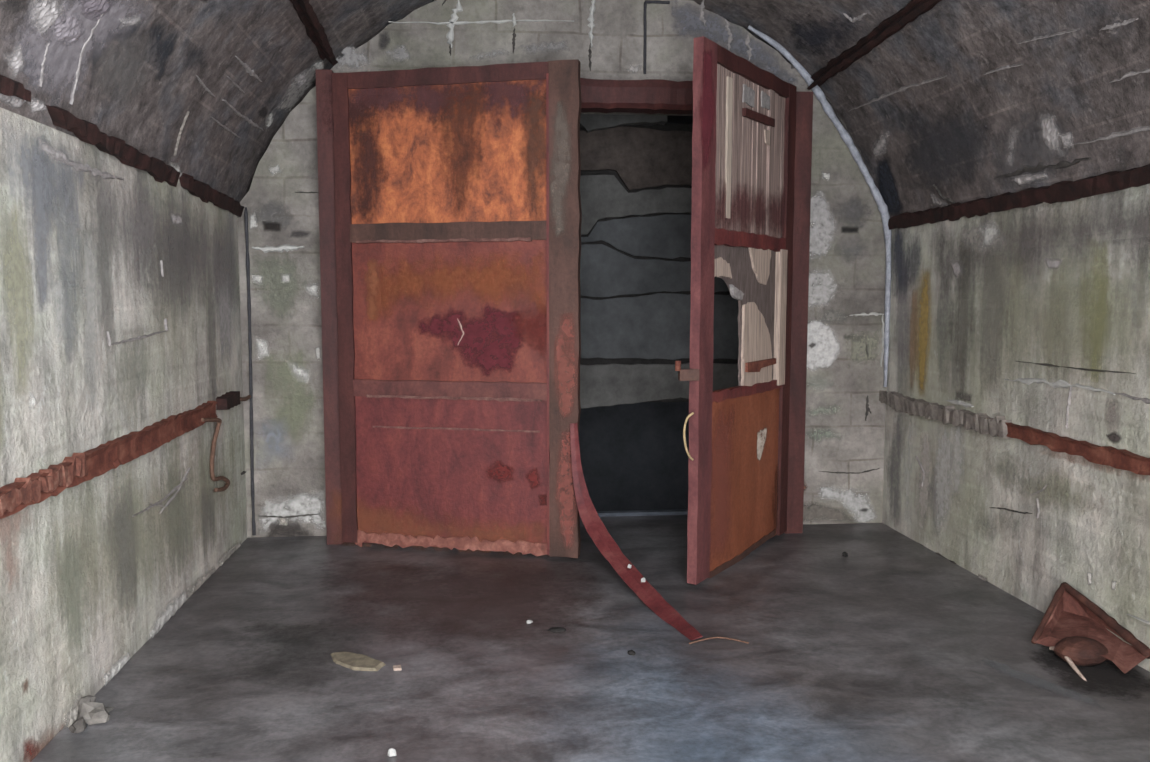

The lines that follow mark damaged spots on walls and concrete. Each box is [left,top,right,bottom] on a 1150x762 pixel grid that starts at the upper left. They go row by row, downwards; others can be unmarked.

damp [3,140,97,398]
damp [98,182,234,357]
rust [350,106,382,218]
rust [443,86,483,208]
rust [522,97,571,235]
peeling [809,196,863,255]
peeling [807,273,884,369]
damp [893,228,920,371]
damp [937,223,1002,394]
damp [1006,200,1150,370]
spalling [260,495,326,537]
damp [889,418,901,518]